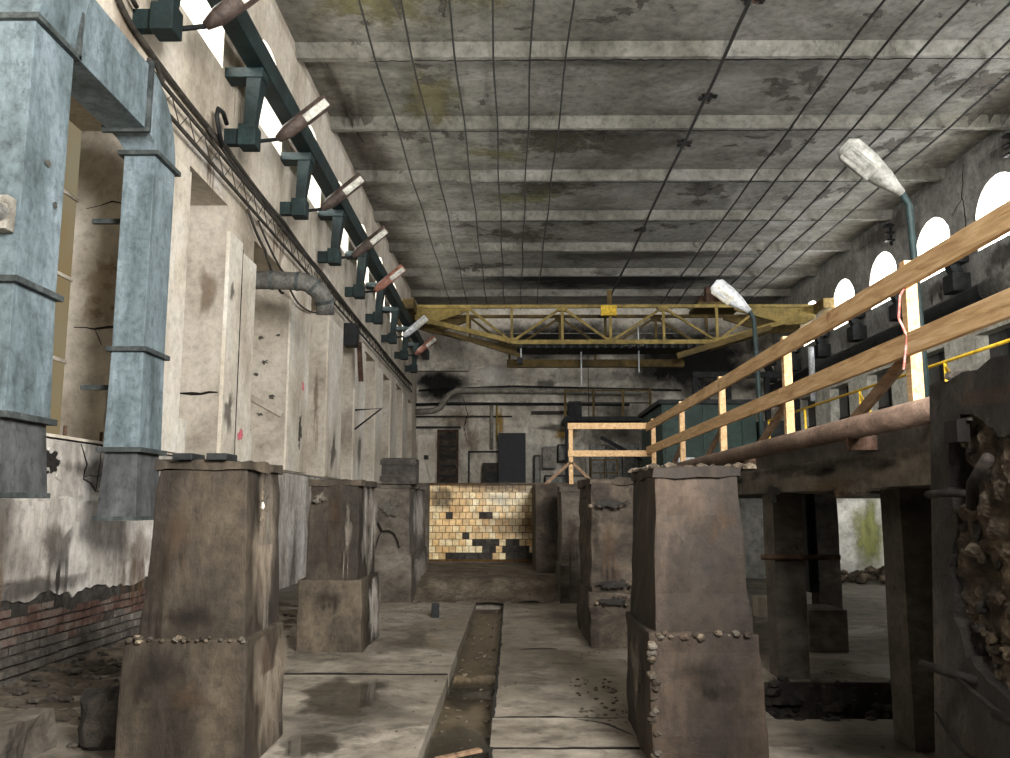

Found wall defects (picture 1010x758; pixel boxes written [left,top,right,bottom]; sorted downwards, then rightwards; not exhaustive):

damp [514,183,584,197]
peeling [446,532,532,559]
spalling [924,415,1010,690]
flaking render [0,589,245,687]